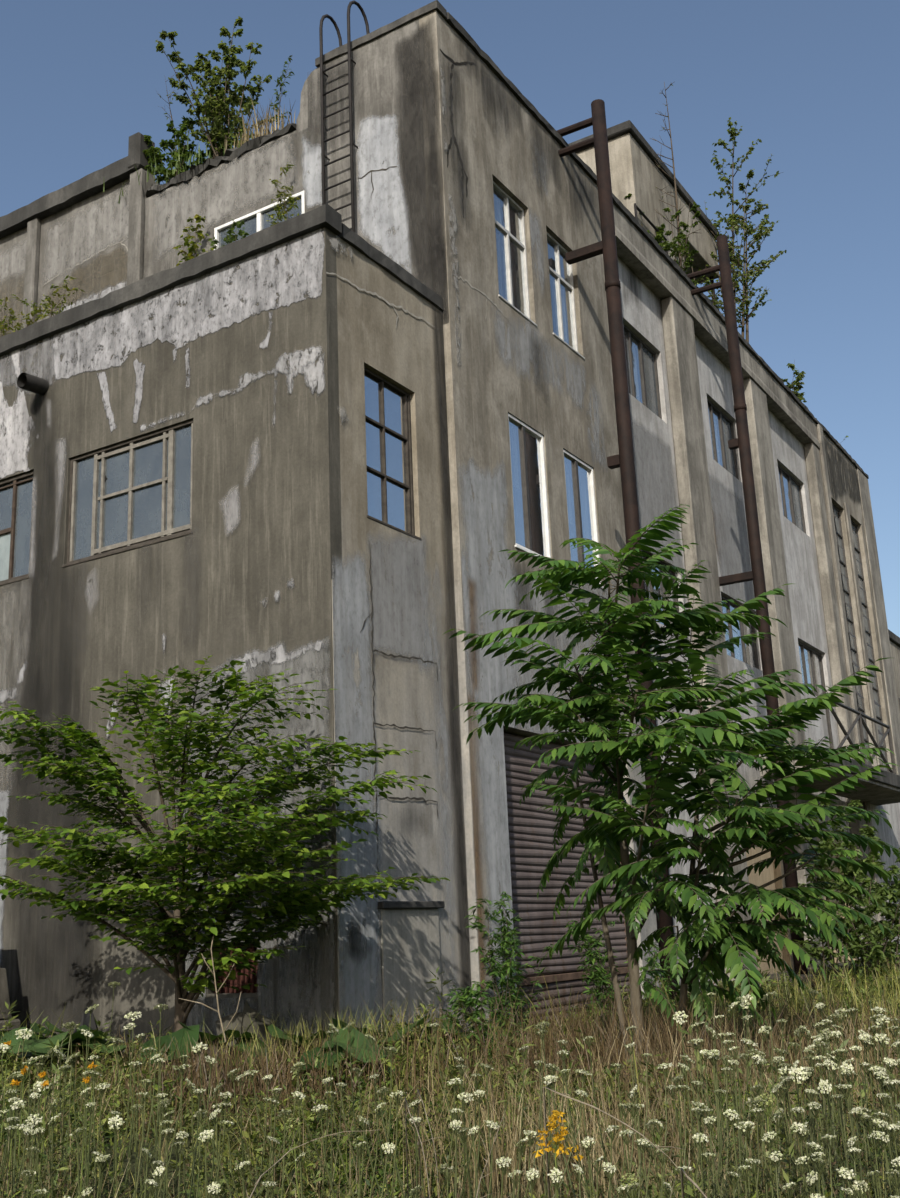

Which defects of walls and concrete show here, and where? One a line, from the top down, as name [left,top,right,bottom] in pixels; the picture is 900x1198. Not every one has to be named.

crack [440,49,475,218]
damp [467,51,516,123]
peeling [0,349,39,479]
peeling [53,228,353,432]
damp [398,26,473,1014]
peeling [0,664,26,703]
crack [360,541,438,900]